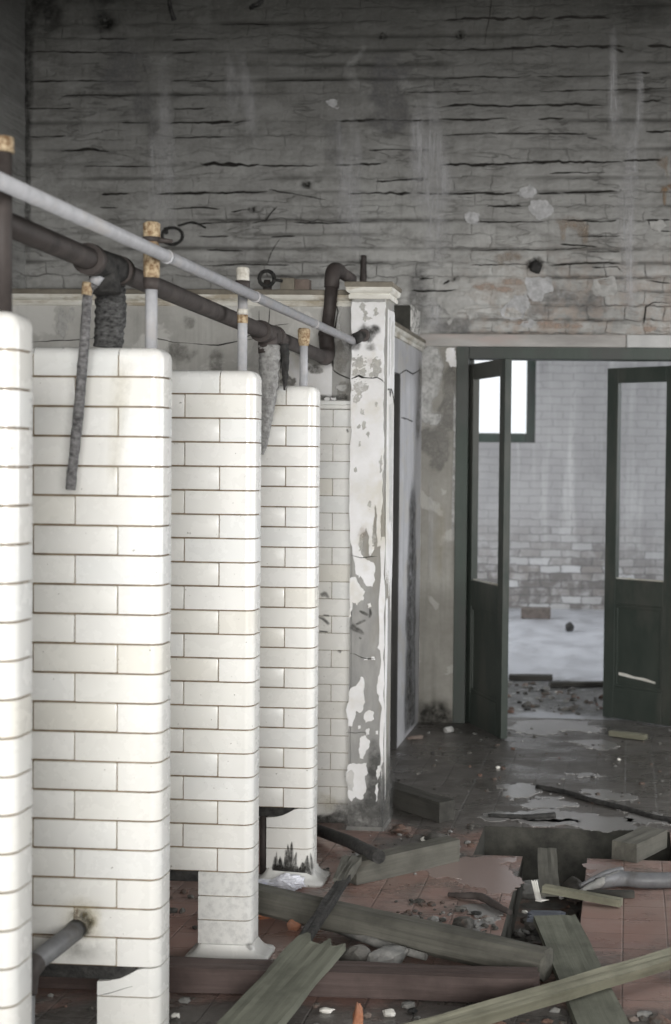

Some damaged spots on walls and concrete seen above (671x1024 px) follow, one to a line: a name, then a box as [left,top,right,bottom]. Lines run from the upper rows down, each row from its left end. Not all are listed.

crack [35,38,135,54]
crack [26,80,141,110]
crack [32,135,151,167]
crack [123,0,671,272]
crack [100,192,129,208]
flaking render [517,184,554,220]
crack [411,278,456,292]
flaking render [591,276,618,297]
crack [644,280,671,322]
leakage [418,367,456,470]
peeling [346,302,395,802]